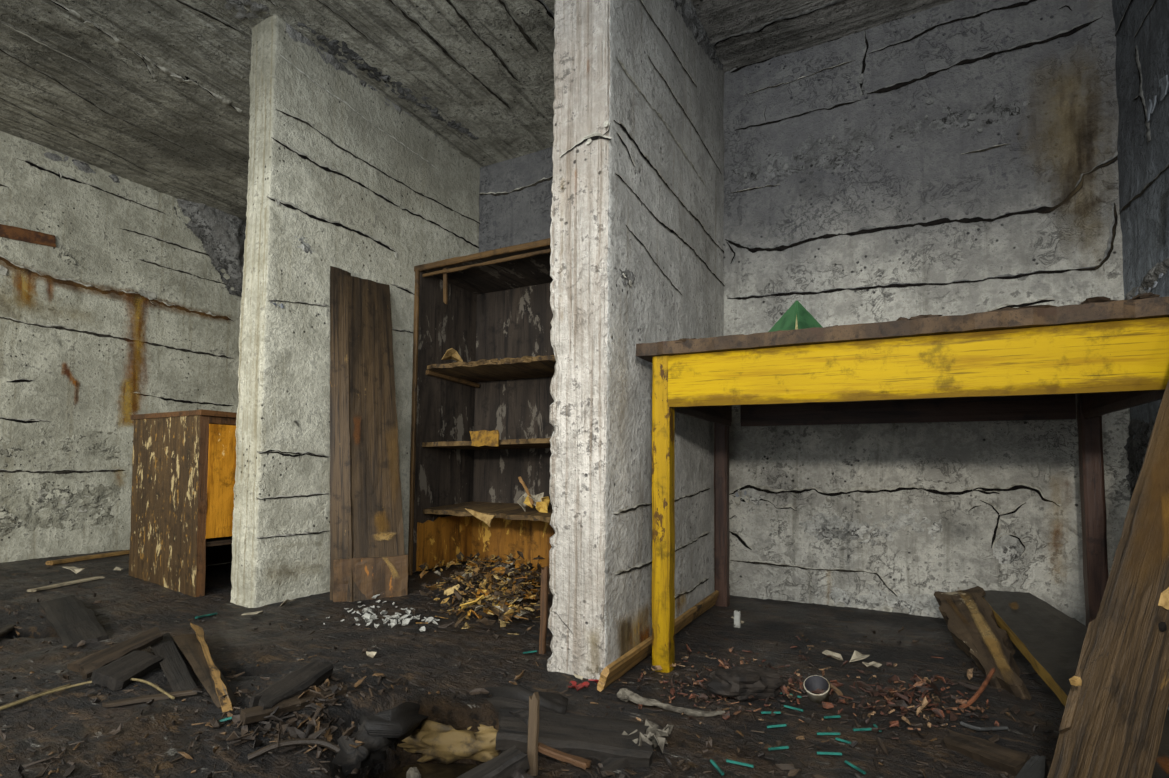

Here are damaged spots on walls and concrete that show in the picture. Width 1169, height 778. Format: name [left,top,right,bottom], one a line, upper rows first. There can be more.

corrosion [0,224,56,247]
crack [560,120,1118,311]
crack [713,0,1151,142]
damp [1049,70,1099,217]
corrosion [0,261,183,425]
crack [729,482,1062,556]